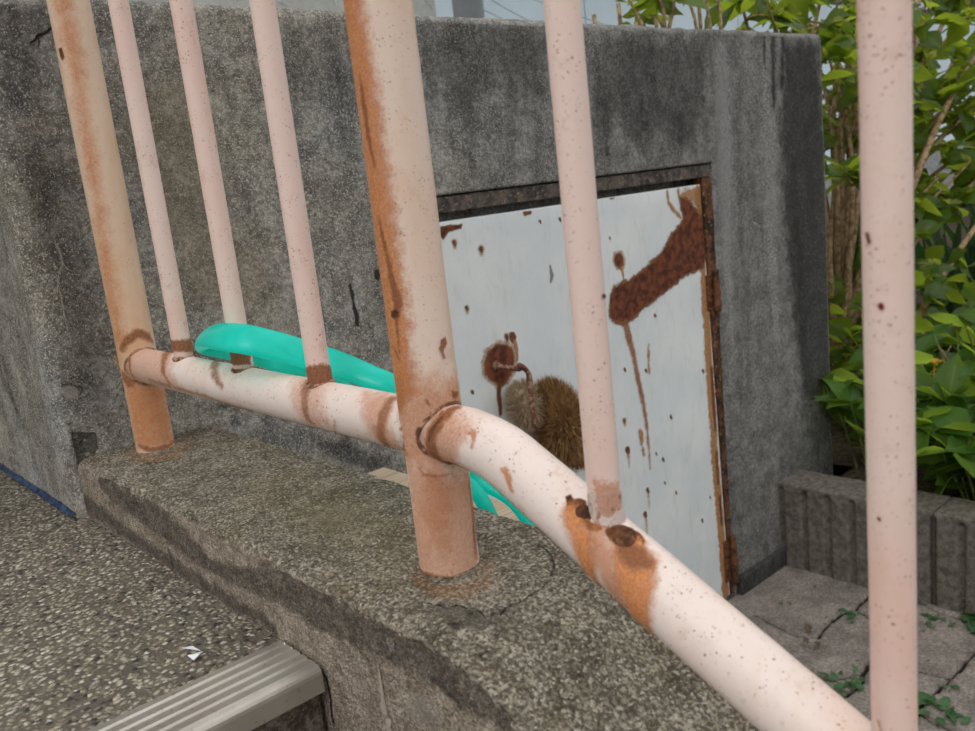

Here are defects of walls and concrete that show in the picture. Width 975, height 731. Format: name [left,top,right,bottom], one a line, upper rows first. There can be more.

corrosion [344,0,413,448]
corrosion [440,224,463,246]
corrosion [119,329,153,387]
corrosion [161,337,193,384]
corrosion [482,332,518,416]
corrosion [602,185,729,599]
corrosion [425,391,461,489]